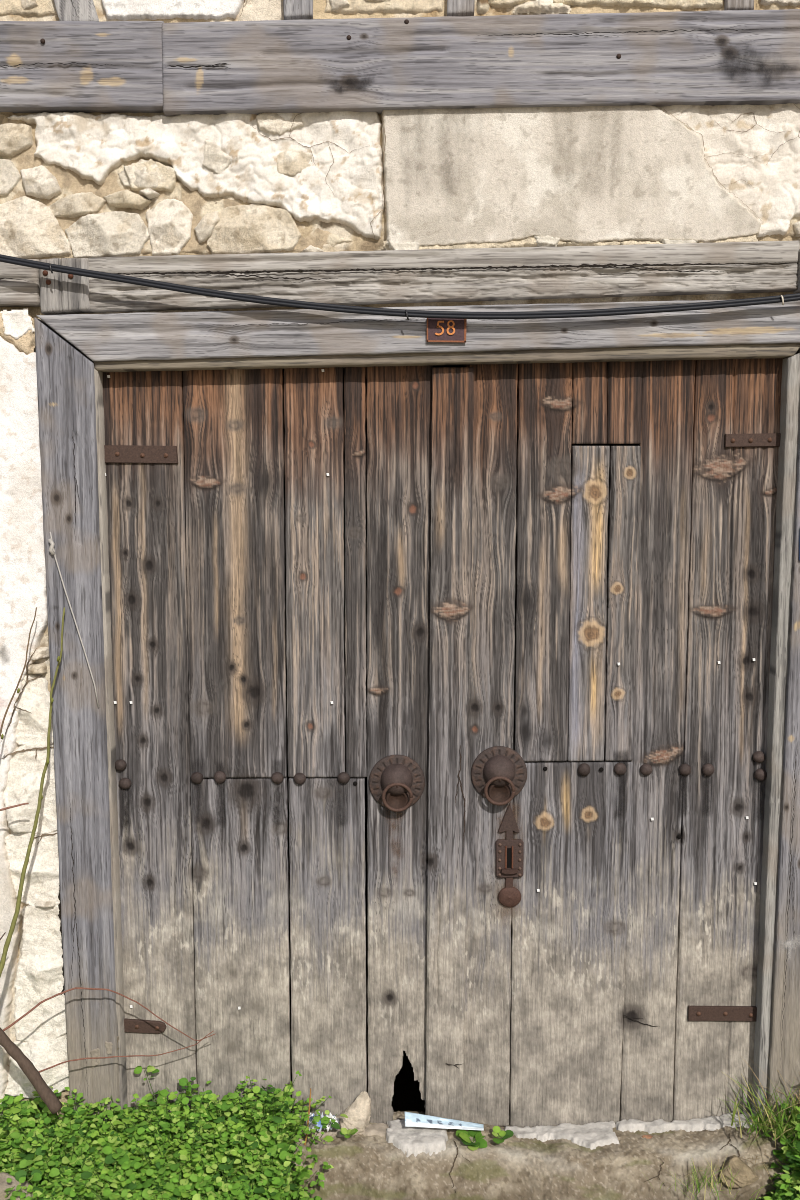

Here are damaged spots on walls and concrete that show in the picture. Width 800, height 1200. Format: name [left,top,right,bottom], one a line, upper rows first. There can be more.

peeling [0,309,36,355]
spalling [4,647,69,1100]